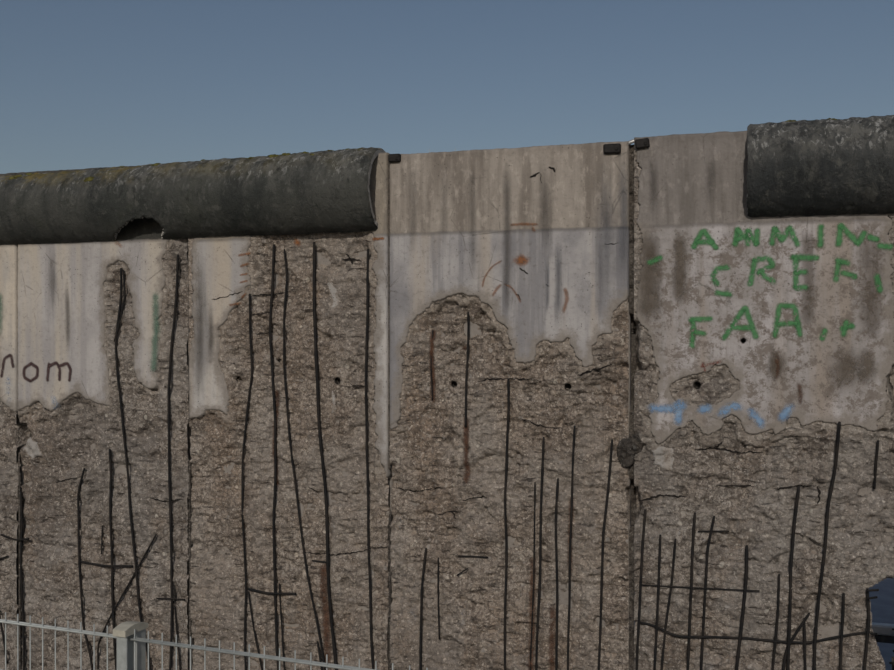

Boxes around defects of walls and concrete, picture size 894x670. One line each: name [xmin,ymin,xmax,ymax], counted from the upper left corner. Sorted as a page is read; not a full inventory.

spalling [0,150,894,670]